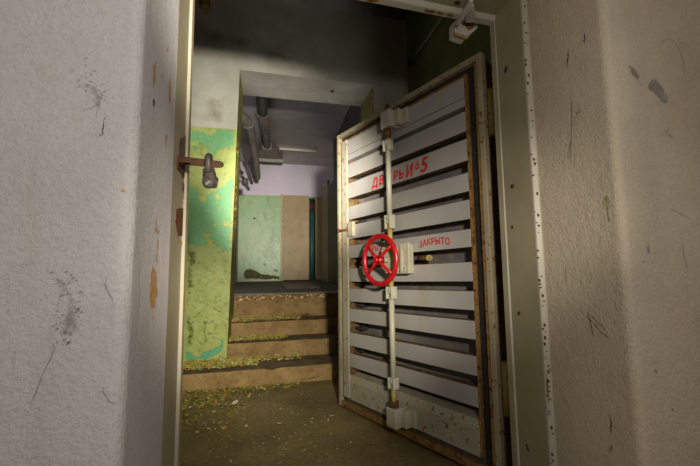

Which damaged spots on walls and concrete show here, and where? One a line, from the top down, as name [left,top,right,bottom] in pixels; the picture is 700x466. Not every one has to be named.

peeling [187,130,239,251]
corrosion [176,202,184,245]
crack [29,344,55,409]